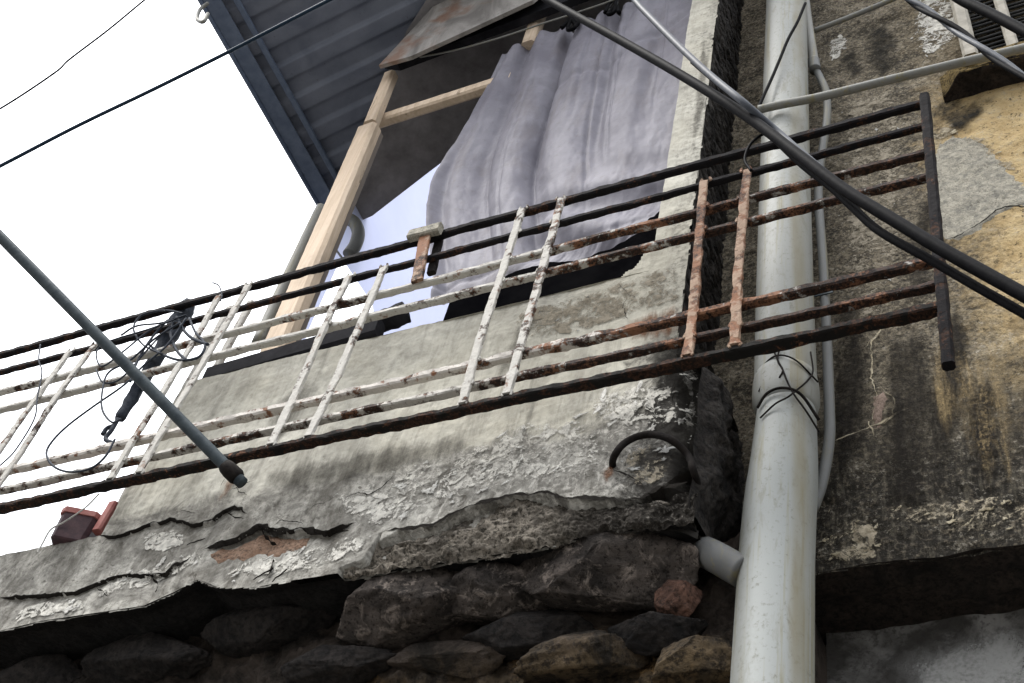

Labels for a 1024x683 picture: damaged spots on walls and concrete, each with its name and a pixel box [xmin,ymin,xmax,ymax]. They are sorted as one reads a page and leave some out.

peeling [934,124,1024,241]
leakage [835,334,866,470]
leakage [888,315,996,501]
crack [1,477,392,600]
spalling [98,372,698,596]